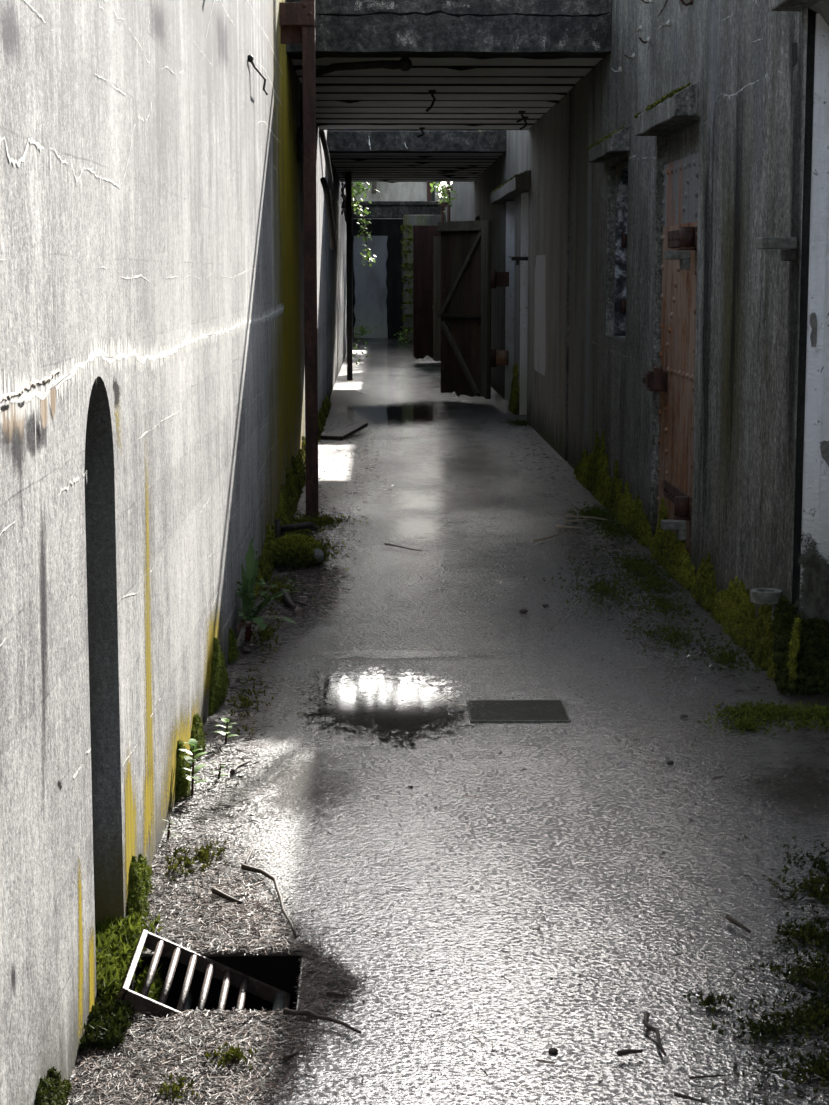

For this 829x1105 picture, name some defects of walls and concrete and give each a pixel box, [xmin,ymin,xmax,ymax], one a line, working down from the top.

crack [0,0,282,188]
crack [0,304,284,469]
peeling [820,441,829,466]
peeling [794,534,829,622]
damp [143,767,154,855]